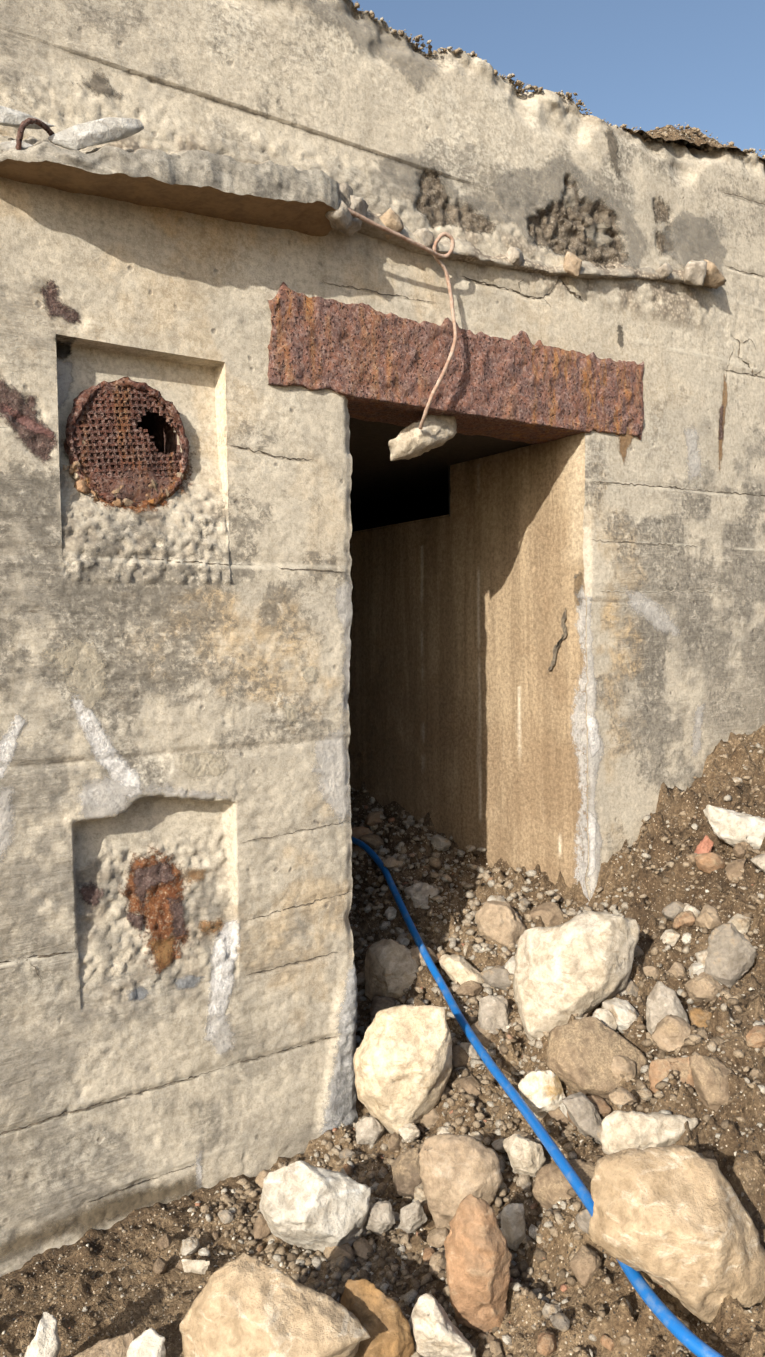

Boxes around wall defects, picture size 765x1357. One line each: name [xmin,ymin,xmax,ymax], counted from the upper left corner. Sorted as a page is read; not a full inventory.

spalling [416,169,496,234]
spalling [527,180,629,269]
corrosion [42,280,80,323]
corrosion [0,380,196,514]
corrosion [79,846,224,974]